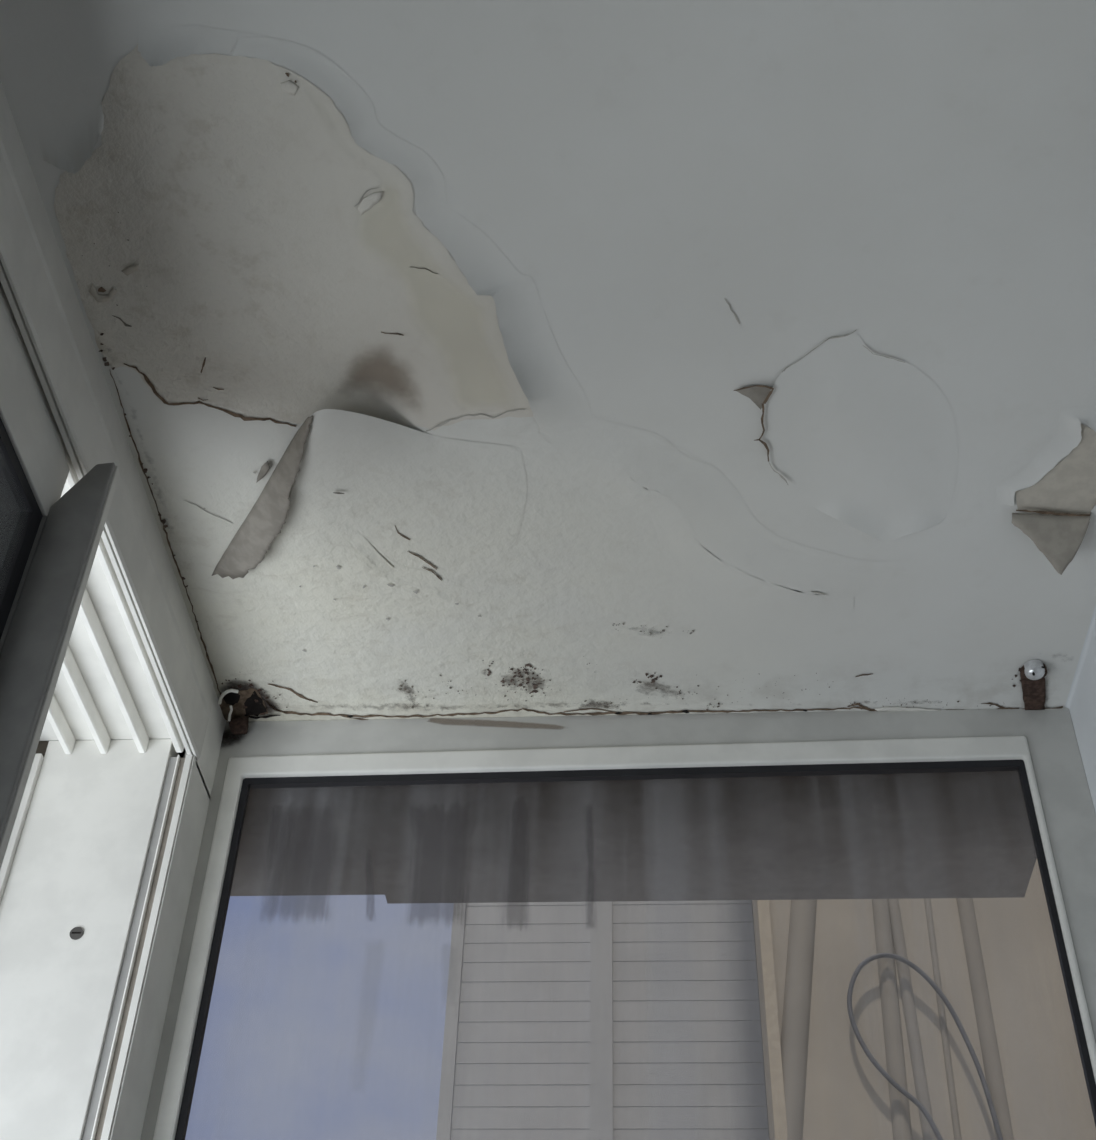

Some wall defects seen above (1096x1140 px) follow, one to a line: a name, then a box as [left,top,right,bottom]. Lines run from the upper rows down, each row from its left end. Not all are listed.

peeling [36,25,593,617]
crack [124,358,296,427]
peeling [995,407,1096,575]
mould [482,660,552,701]
leakage [630,673,699,699]